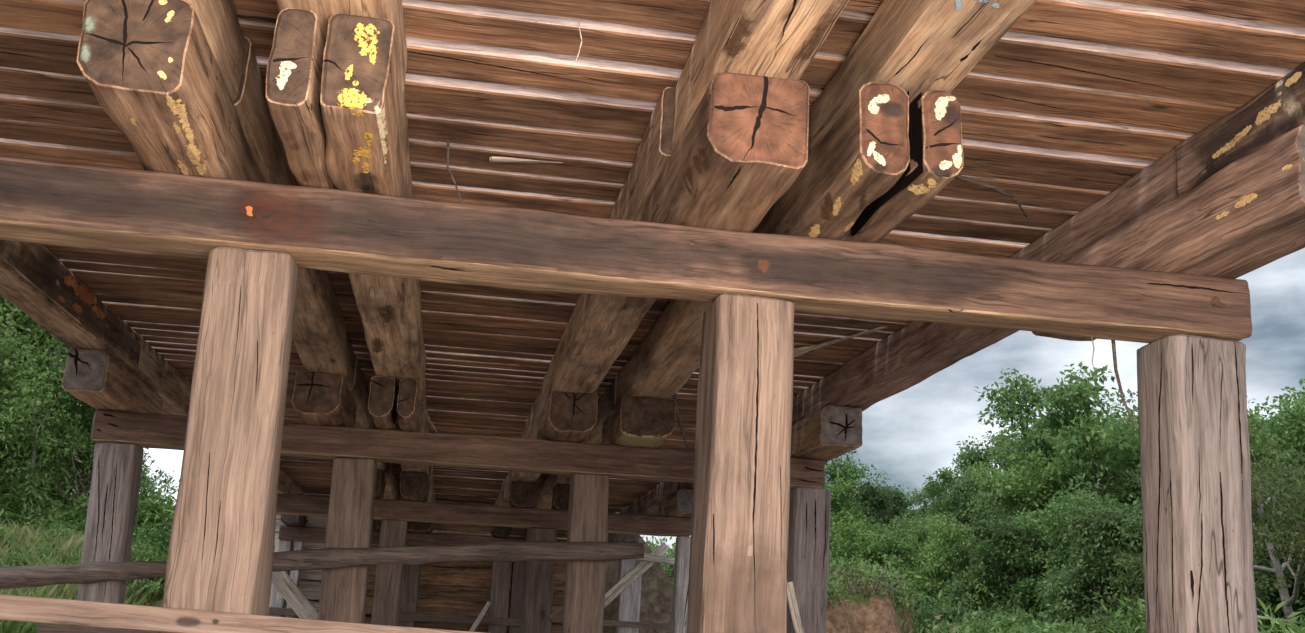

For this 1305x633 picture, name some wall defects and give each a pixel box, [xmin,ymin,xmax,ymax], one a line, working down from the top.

crack [82,0,169,88]
crack [715,0,797,194]
crack [851,0,1212,237]
crack [710,514,718,561]
crack [753,303,826,594]
crack [829,414,860,440]